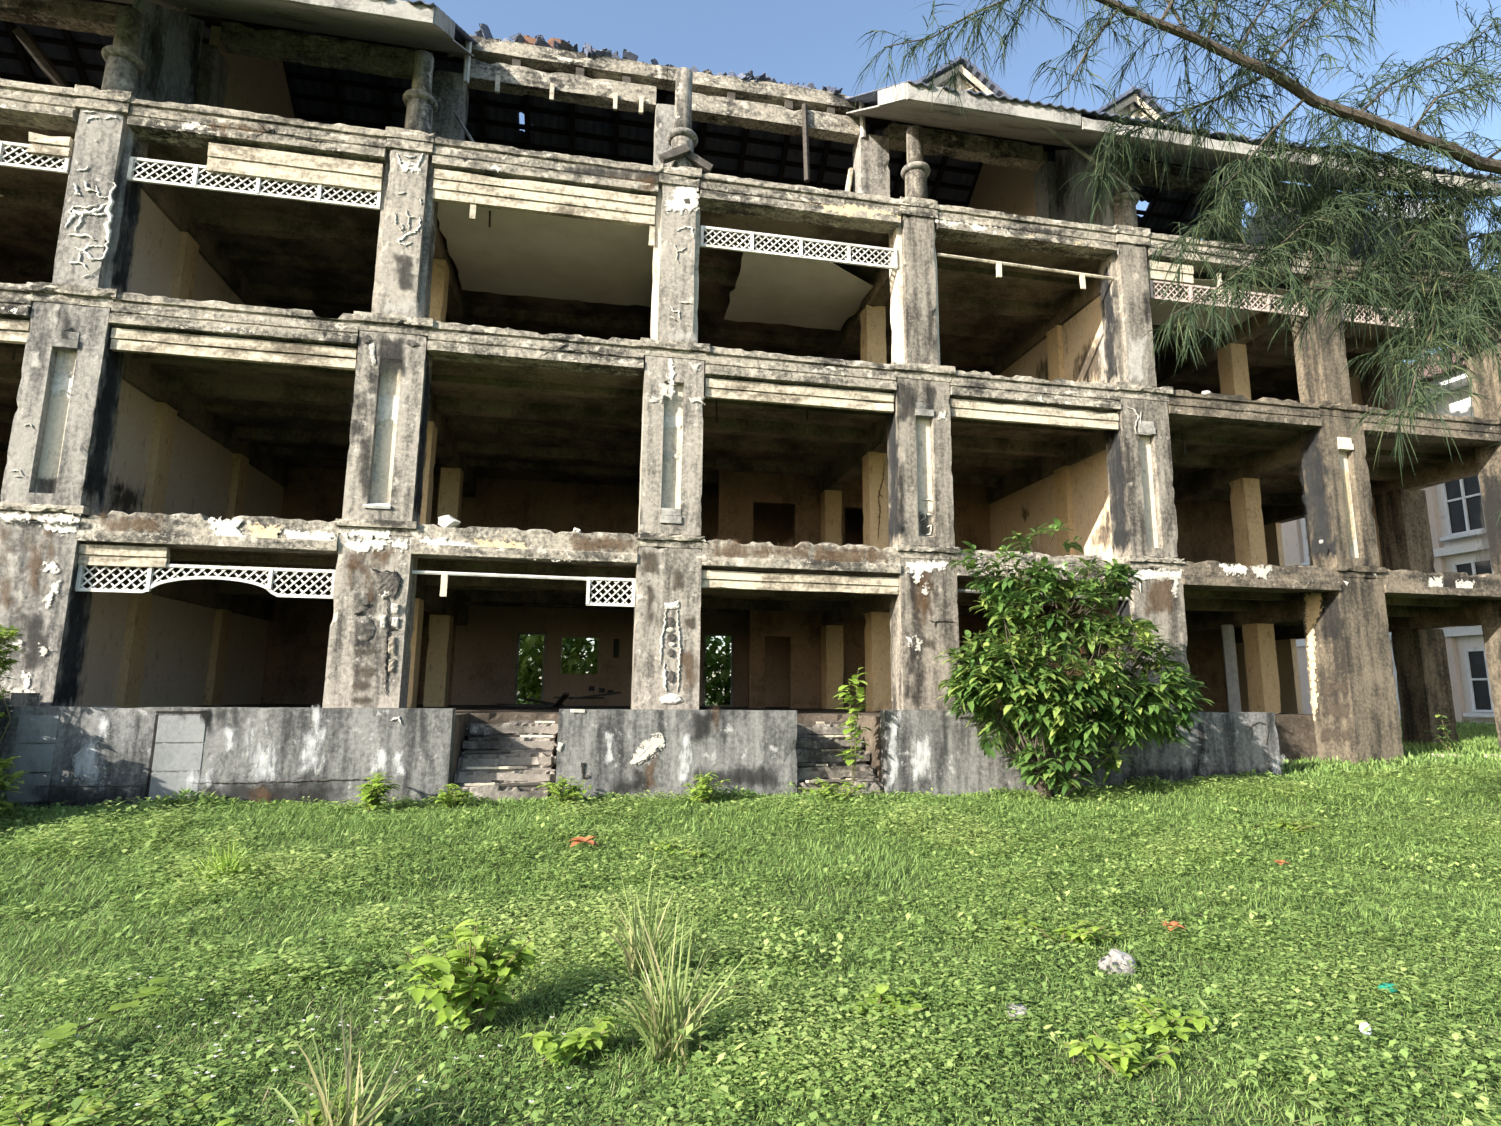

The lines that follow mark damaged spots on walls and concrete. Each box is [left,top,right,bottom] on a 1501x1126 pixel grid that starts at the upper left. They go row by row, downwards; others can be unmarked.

peeling [65,166,117,277]
peeling [664,185,700,262]
peeling [668,301,694,342]
leakage [1427,476,1501,588]
leakage [1322,598,1343,640]
leakage [352,649,374,704]
leakage [1320,681,1349,743]
leakage [36,717,146,809]
leakage [180,708,331,807]
leakage [371,749,404,775]
peeling [630,732,665,766]